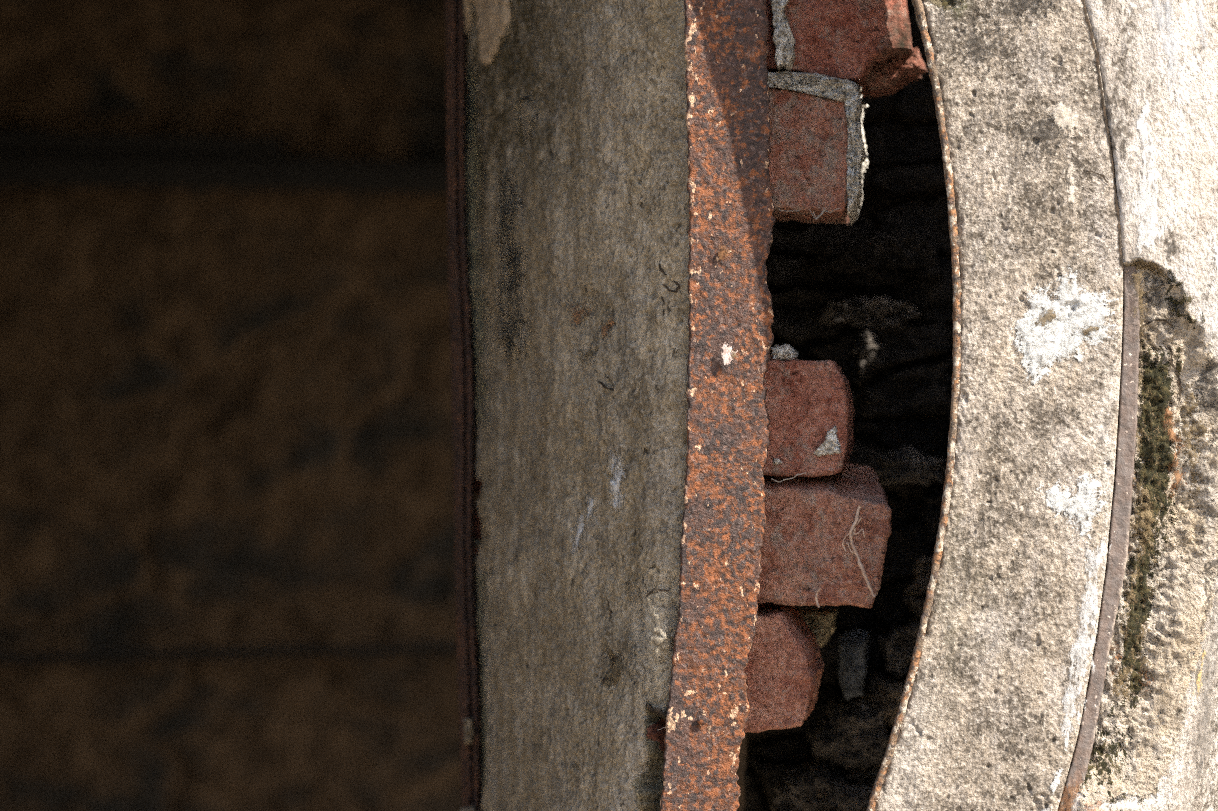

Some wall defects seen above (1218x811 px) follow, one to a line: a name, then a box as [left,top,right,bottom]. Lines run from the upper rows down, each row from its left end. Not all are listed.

spalling [865,47,928,98]
crack [1082,0,1124,270]